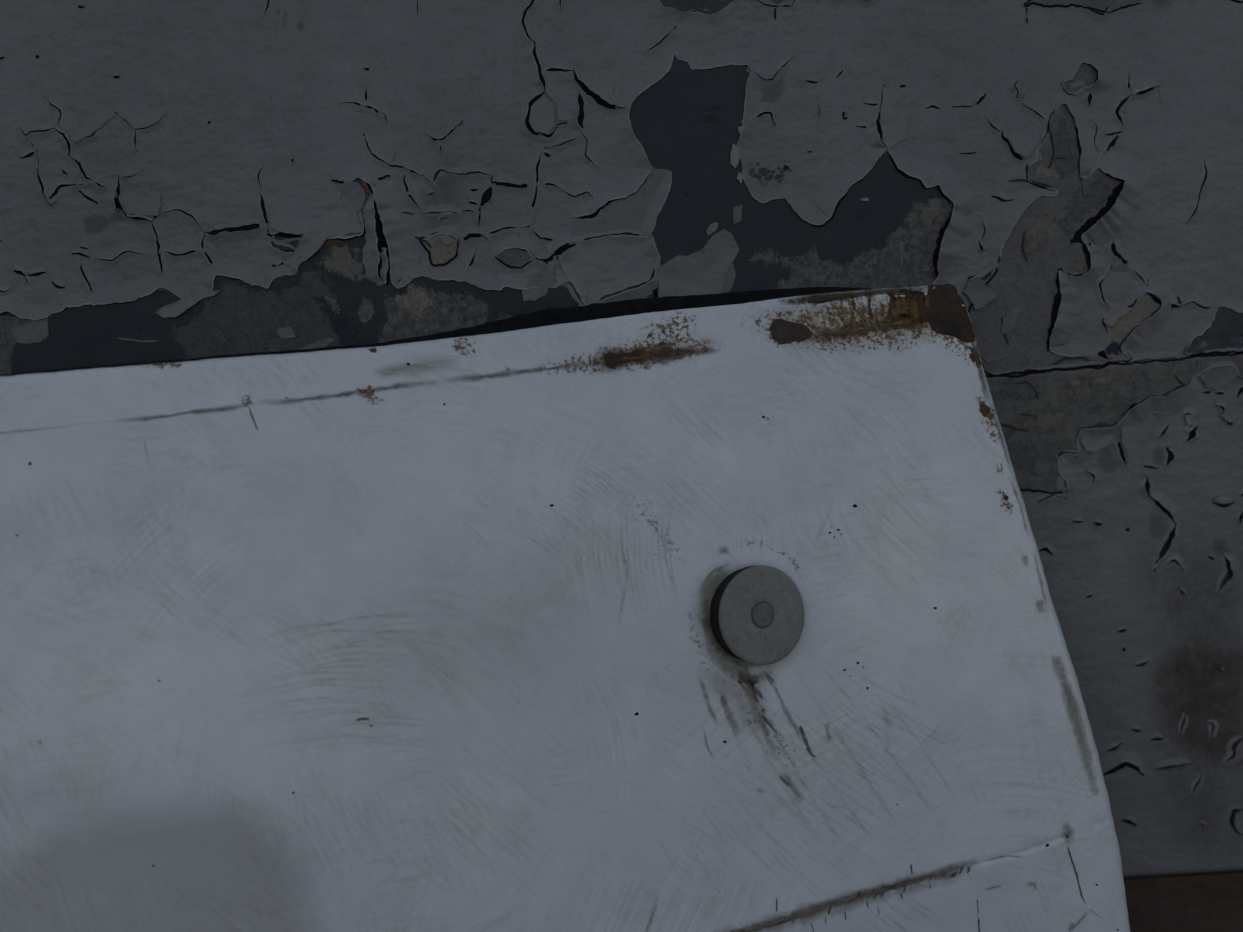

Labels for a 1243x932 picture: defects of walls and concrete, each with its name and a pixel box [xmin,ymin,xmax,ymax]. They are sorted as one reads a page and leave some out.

peeling [646,0,881,27]
peeling [573,68,631,116]
peeling [730,126,747,183]
peeling [0,160,601,375]
peeling [658,205,742,297]
peeling [964,53,1243,506]
rust [452,338,476,356]
rust [545,313,718,373]
rust [356,385,381,404]
rust [752,284,1007,472]
peeling [1221,733,1243,768]